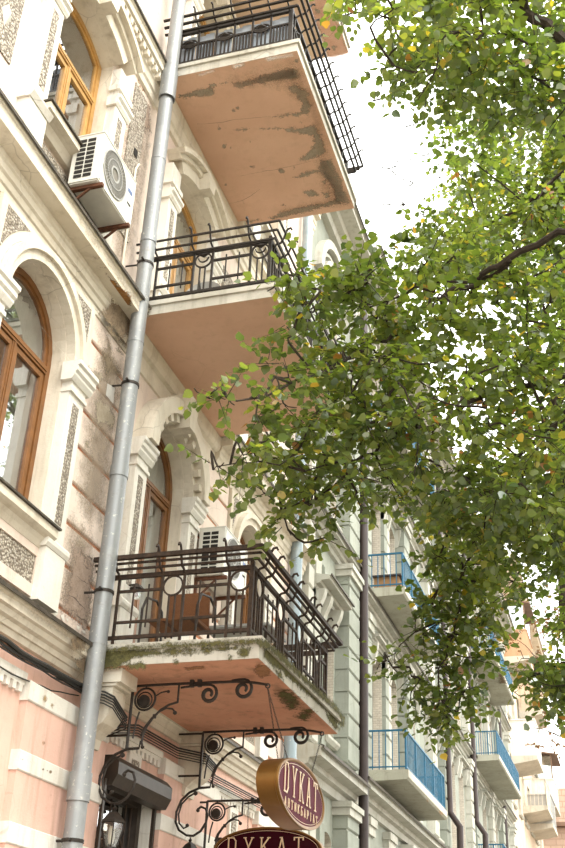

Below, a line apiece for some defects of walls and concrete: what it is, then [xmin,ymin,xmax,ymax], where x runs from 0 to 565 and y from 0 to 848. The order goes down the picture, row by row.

peeling [179,59,311,118]
peeling [260,125,349,219]
water stain [84,334,127,513]
water stain [104,638,345,730]